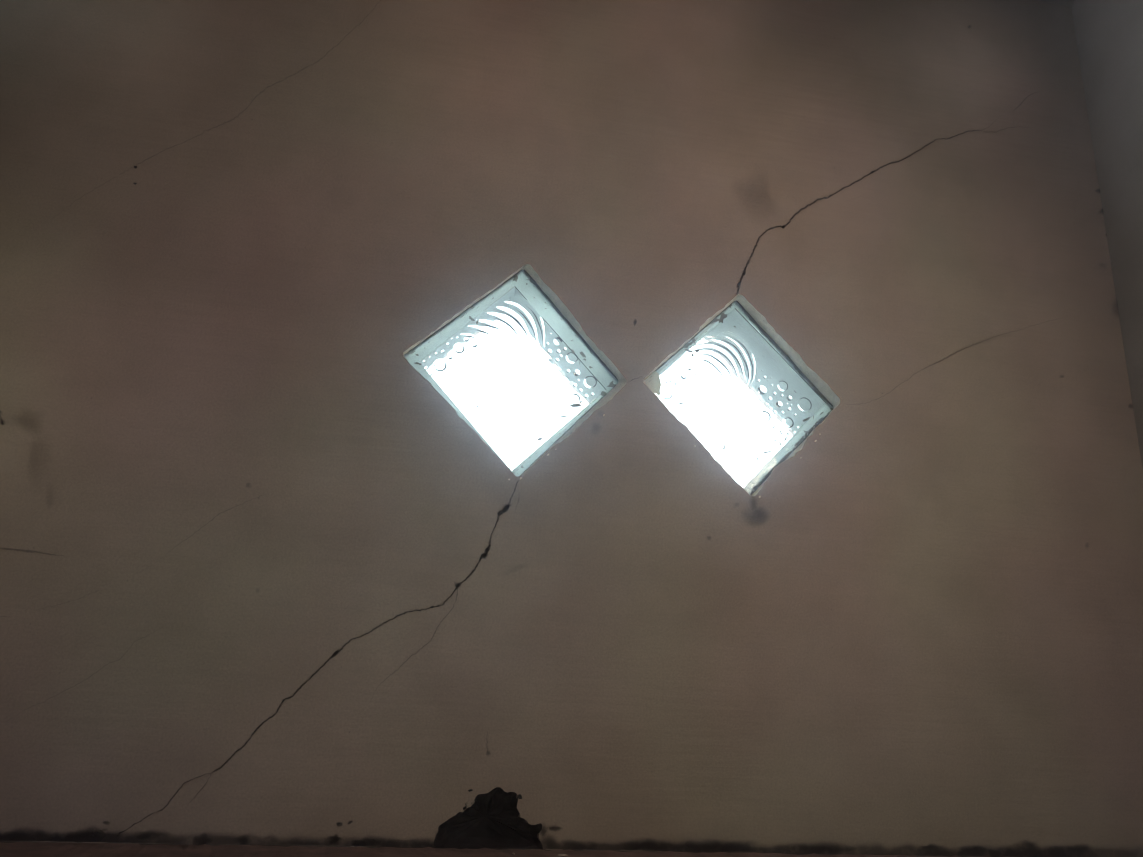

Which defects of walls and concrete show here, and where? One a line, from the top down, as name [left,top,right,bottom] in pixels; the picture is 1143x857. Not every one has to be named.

crack [736,91,1040,294]
crack [119,481,518,833]
spalling [434,787,566,856]